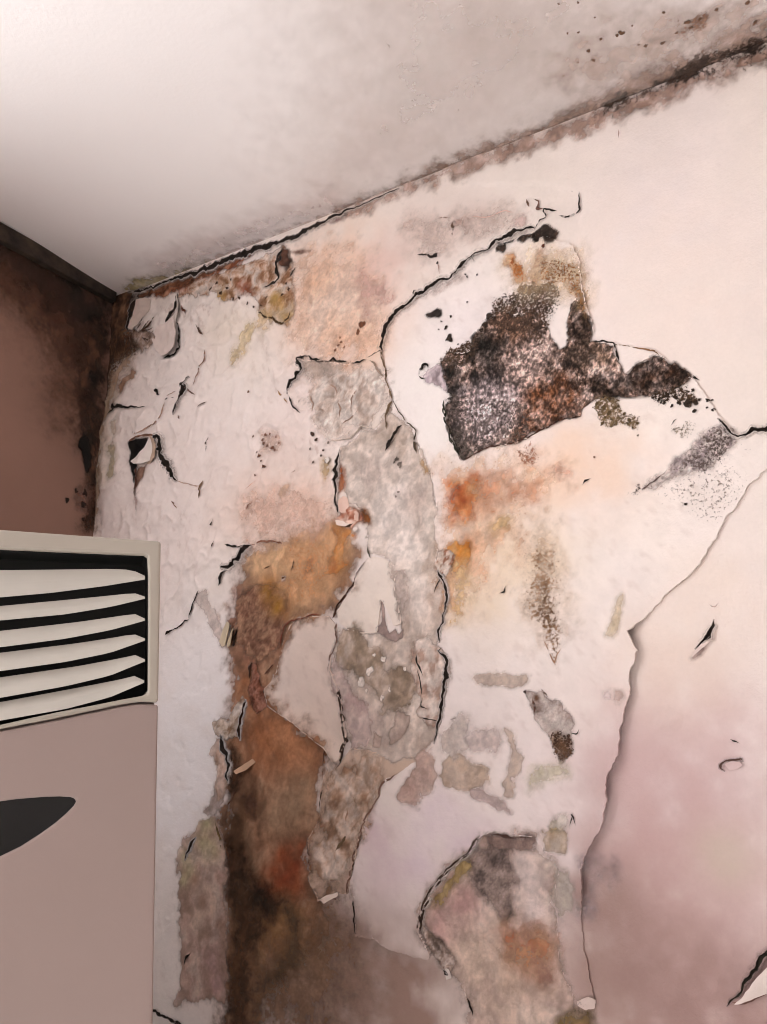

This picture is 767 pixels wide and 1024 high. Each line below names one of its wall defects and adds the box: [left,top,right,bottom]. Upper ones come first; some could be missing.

leakage [274,1,767,236]
leakage [0,244,192,532]
spalling [125,245,305,358]
crack [133,188,399,298]
leakage [419,282,743,523]
spalling [195,590,238,647]
peeling [264,237,767,1024]
spalling [210,697,255,801]
leakage [173,782,236,1007]
leakage [556,1009,594,1024]